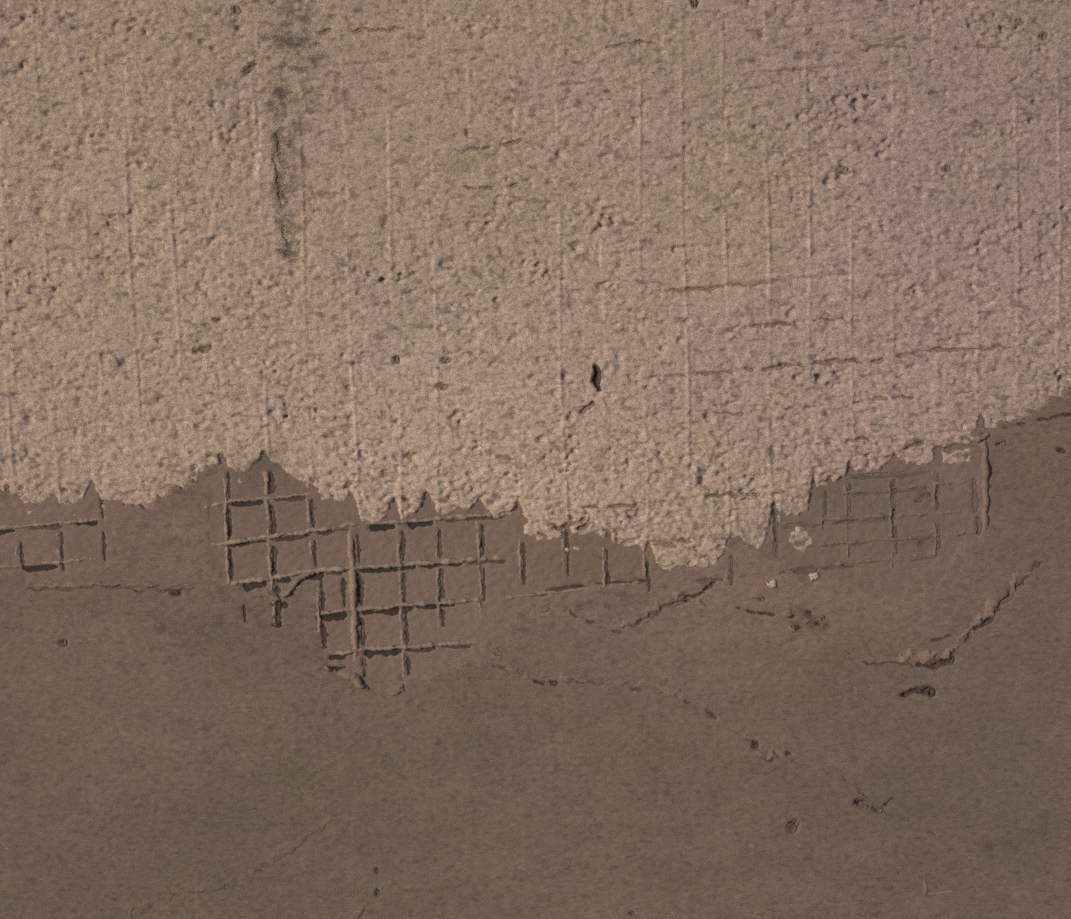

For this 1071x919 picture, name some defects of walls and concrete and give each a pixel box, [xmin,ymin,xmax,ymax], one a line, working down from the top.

spalling [0,480,123,584]
spalling [196,451,651,696]
crack [415,646,716,720]
crack [565,579,717,633]
crack [737,598,774,617]
spalling [696,431,995,602]
crack [845,561,1043,703]
crack [842,776,935,835]